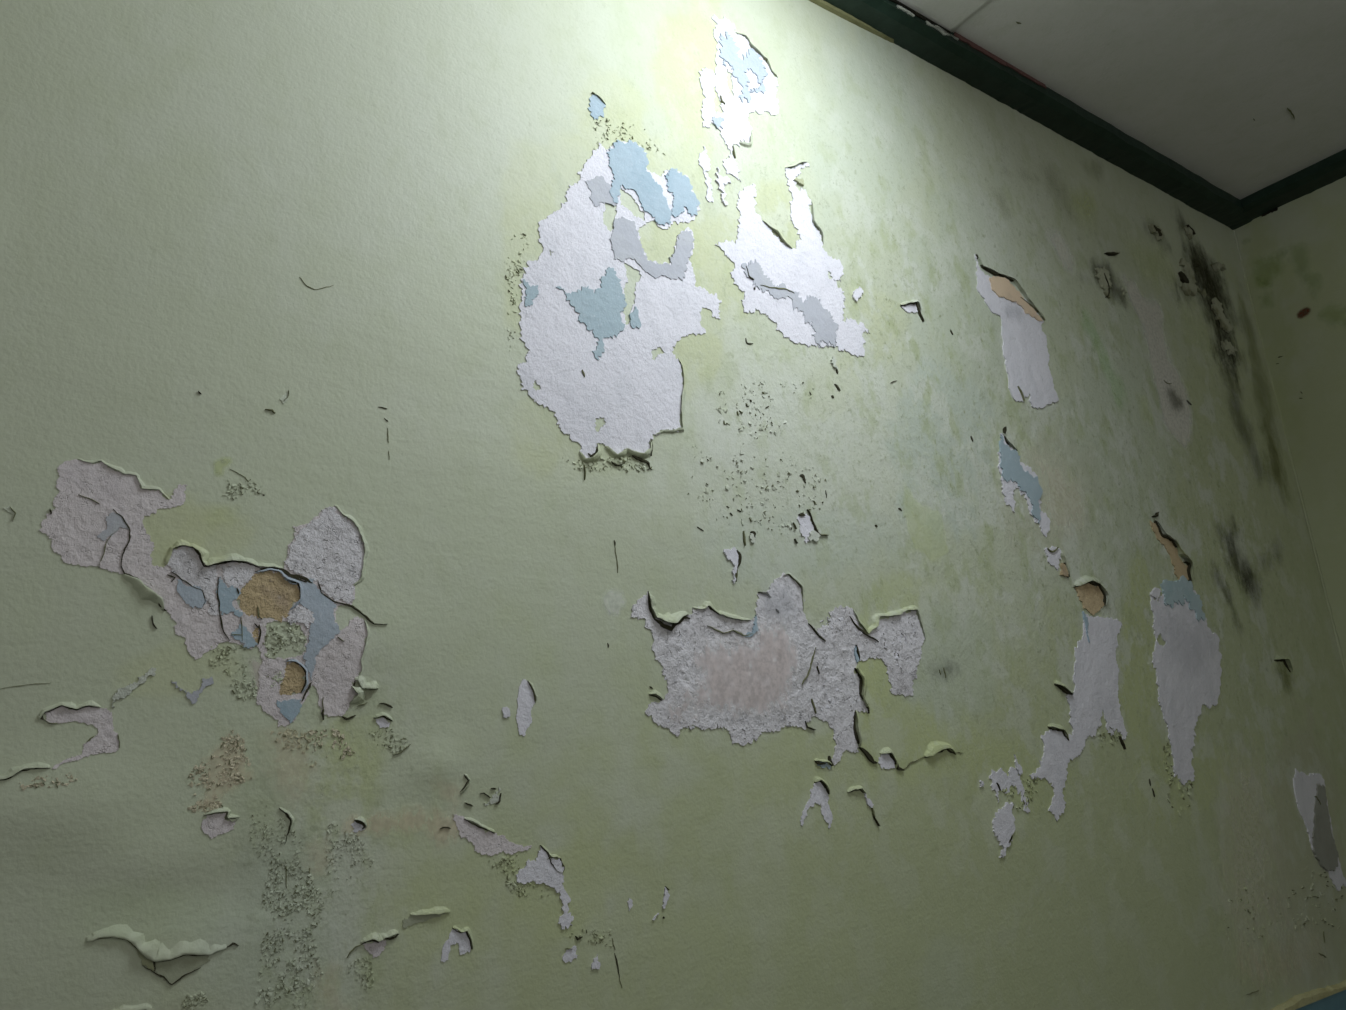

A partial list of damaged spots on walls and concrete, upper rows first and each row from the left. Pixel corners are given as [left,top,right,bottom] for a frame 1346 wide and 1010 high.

peeling [504,15,870,480]
peeling [974,254,1059,409]
damp [1094,252,1192,444]
damp [1178,223,1238,362]
peeling [36,458,383,769]
peeling [630,572,926,829]
peeling [979,427,1128,858]
peeling [1149,575,1222,816]
peeling [86,924,239,1010]
peeling [188,730,374,1010]
peeling [347,906,473,991]
peeling [439,787,613,970]